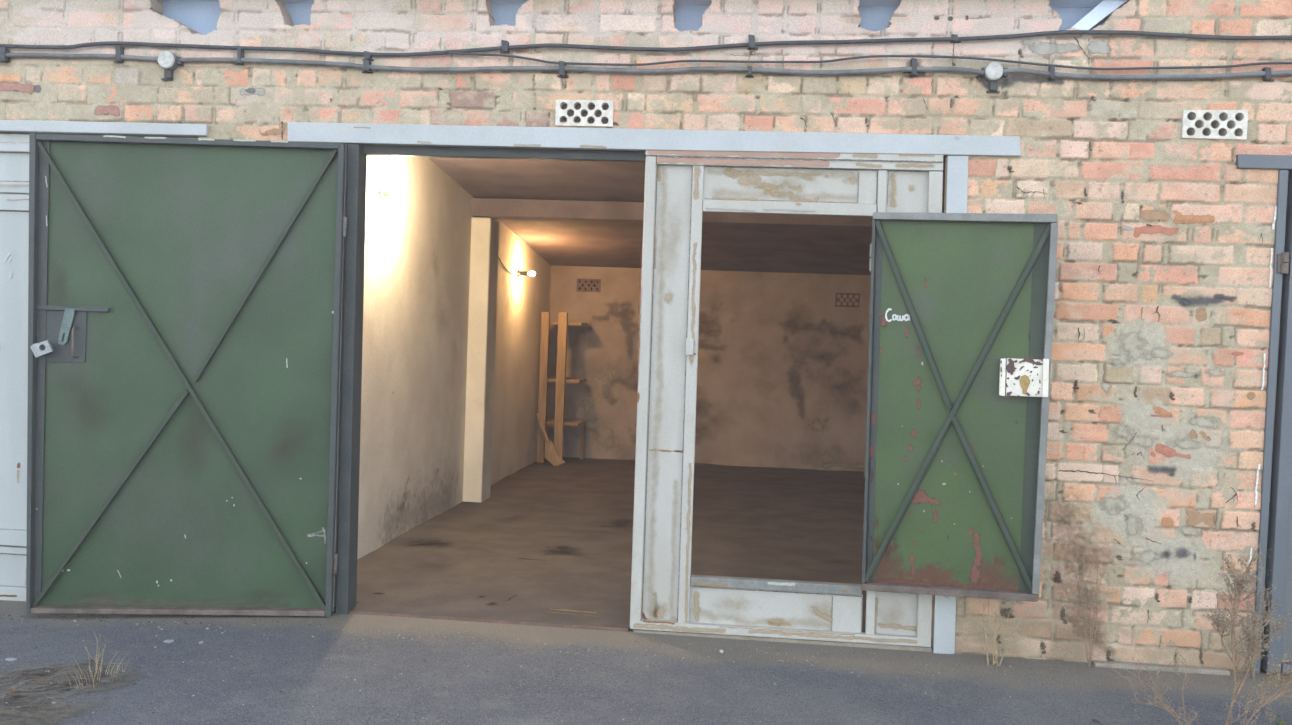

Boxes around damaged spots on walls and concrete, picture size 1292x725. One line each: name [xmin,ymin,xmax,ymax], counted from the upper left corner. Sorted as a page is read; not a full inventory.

water stain [596,304,652,405]
water stain [699,314,723,363]
water stain [696,400,706,434]
peeling [895,490,941,575]
peeling [947,523,998,583]